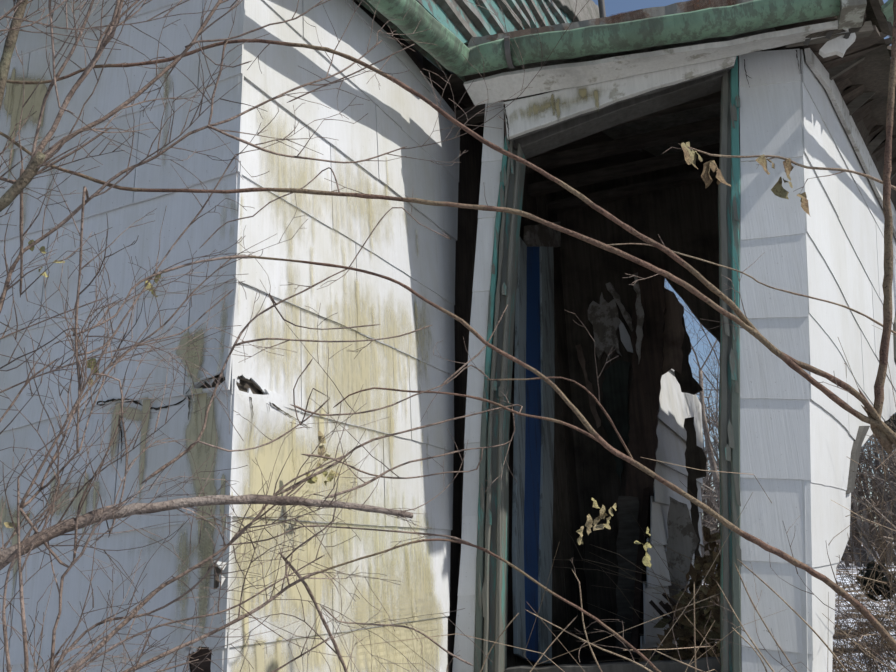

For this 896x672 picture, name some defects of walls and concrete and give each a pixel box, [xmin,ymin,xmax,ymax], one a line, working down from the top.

spalling [195,374,261,395]
water stain [240,493,265,672]
water stain [307,515,320,657]